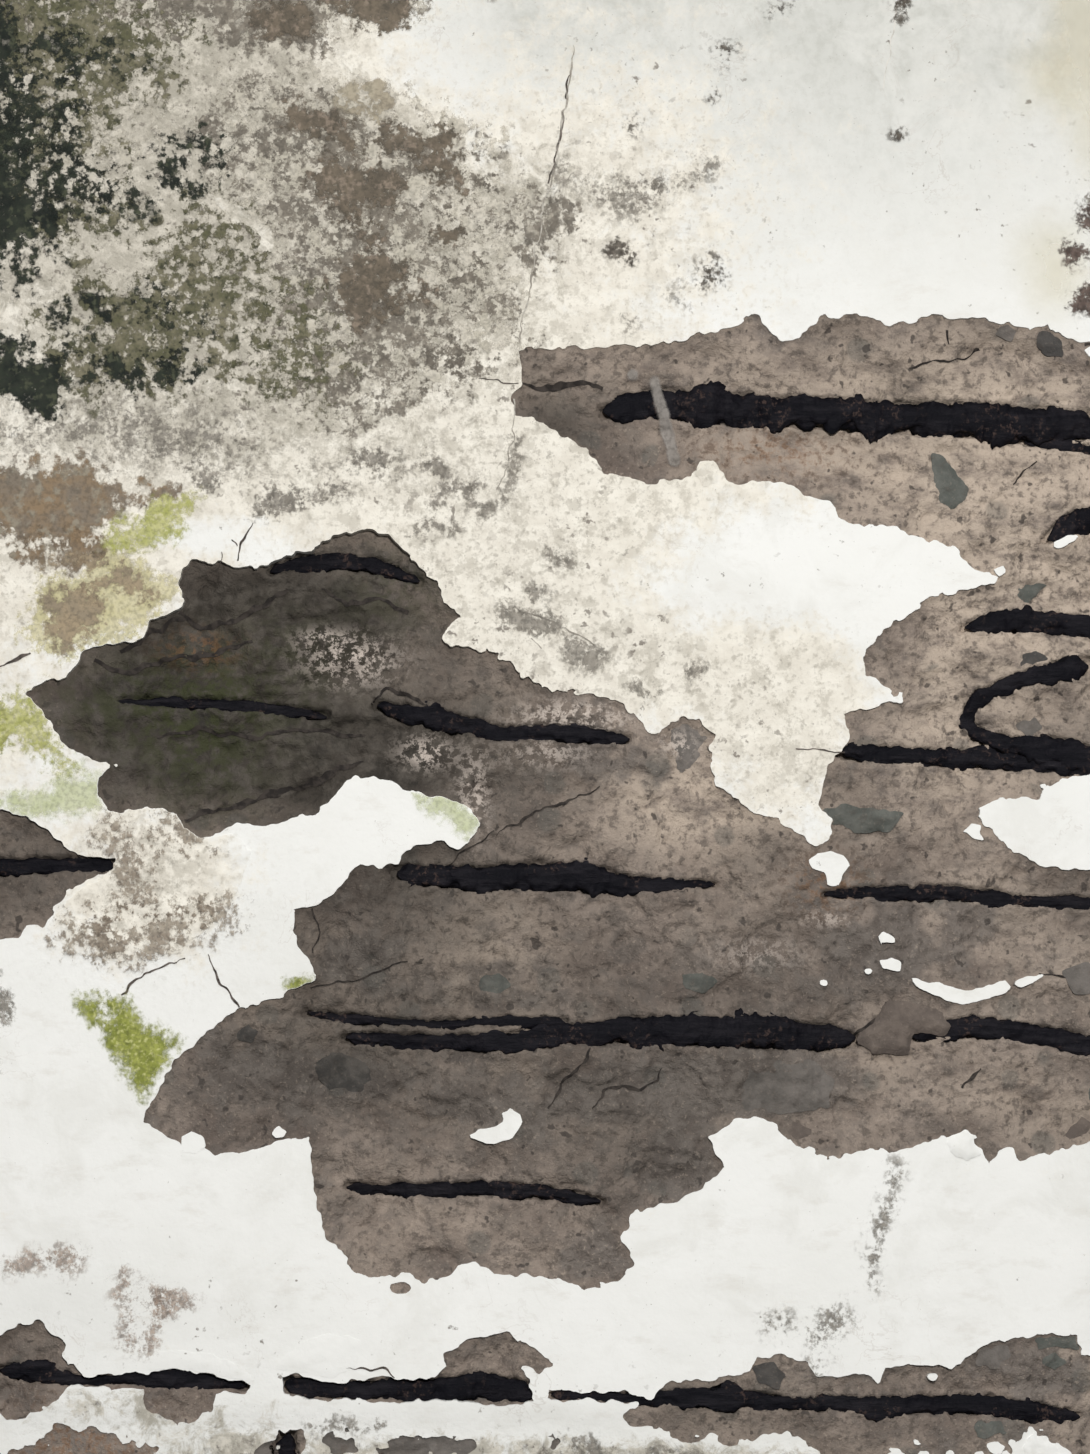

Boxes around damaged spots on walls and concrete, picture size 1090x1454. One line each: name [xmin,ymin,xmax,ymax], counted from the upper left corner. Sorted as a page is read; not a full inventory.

damp [0,0,582,656]
crack [479,45,575,488]
spalling [0,314,1090,1294]
spalling [0,1319,250,1454]
spalling [254,1428,358,1454]
spalling [283,1331,1090,1454]